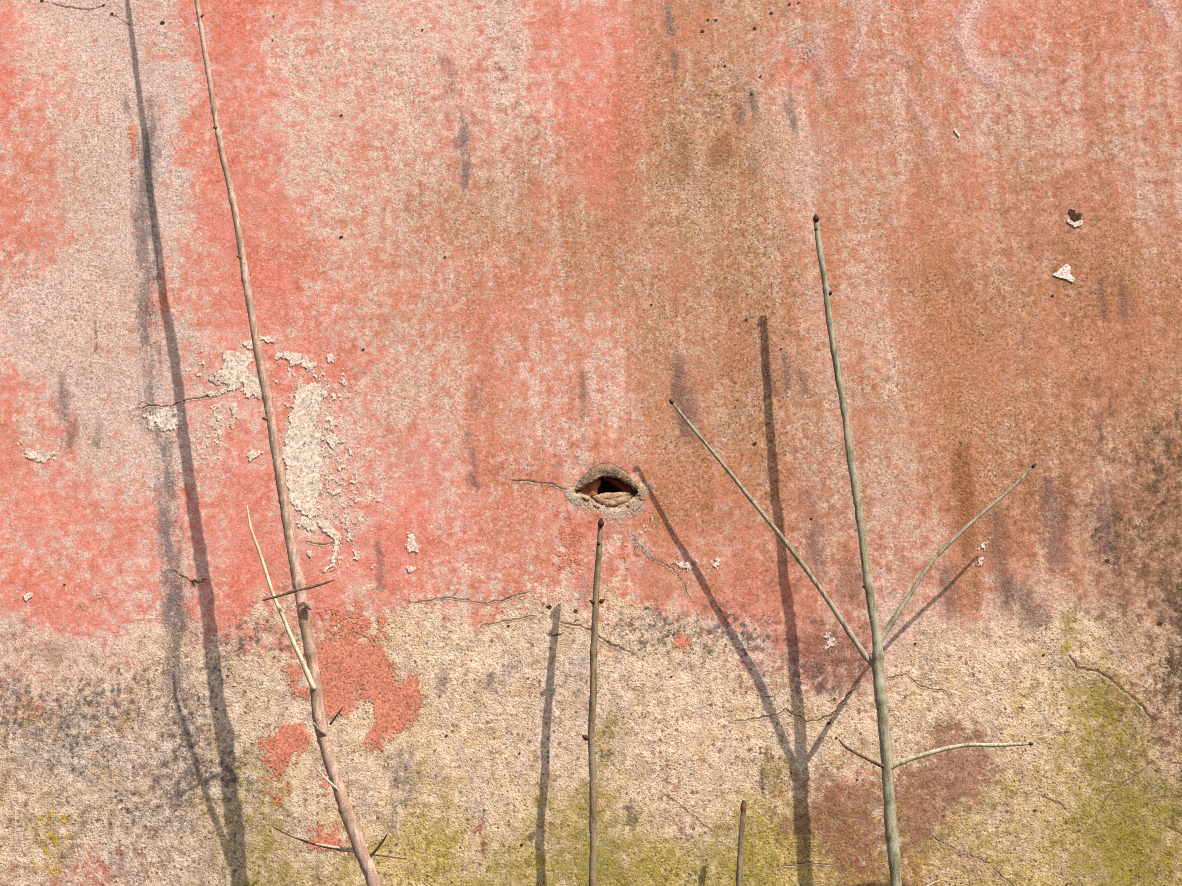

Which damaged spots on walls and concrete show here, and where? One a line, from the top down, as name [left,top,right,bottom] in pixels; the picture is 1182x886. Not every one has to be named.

water stain [131,95,261,829]
peeling [143,335,380,583]
spalling [567,470,660,556]
water stain [1089,409,1182,709]
water stain [204,614,302,680]
water stain [742,744,791,796]
water stain [623,798,642,829]